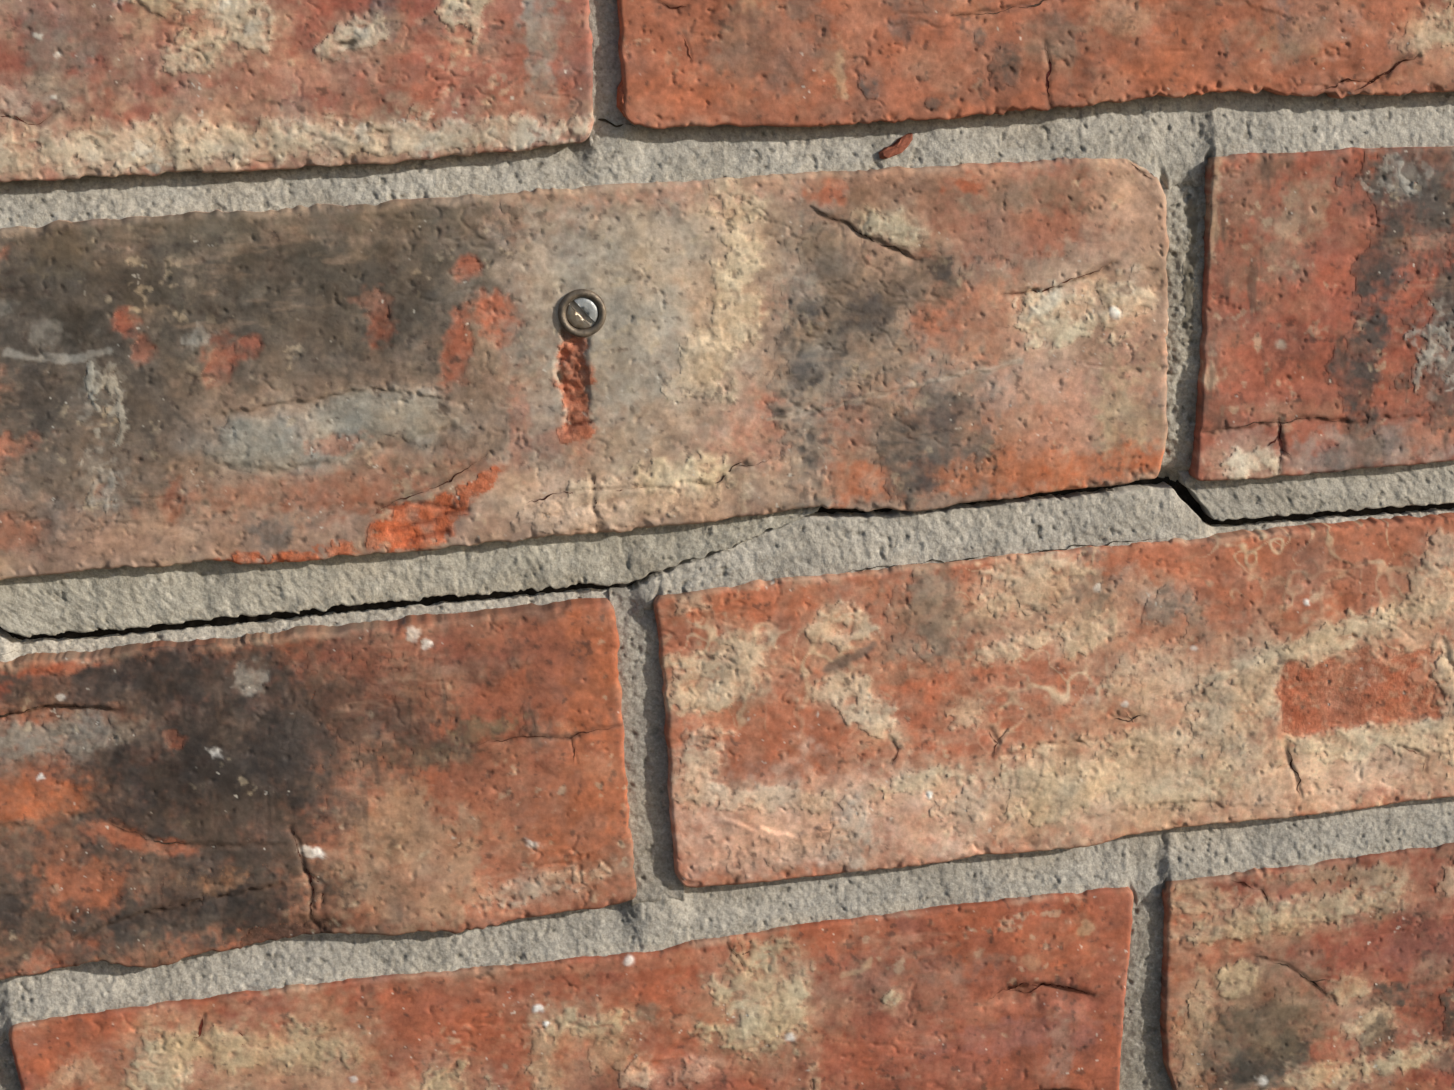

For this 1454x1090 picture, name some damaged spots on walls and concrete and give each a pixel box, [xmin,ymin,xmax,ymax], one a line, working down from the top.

crack [815,506,892,514]
crack [853,476,1454,571]
crack [0,572,655,655]